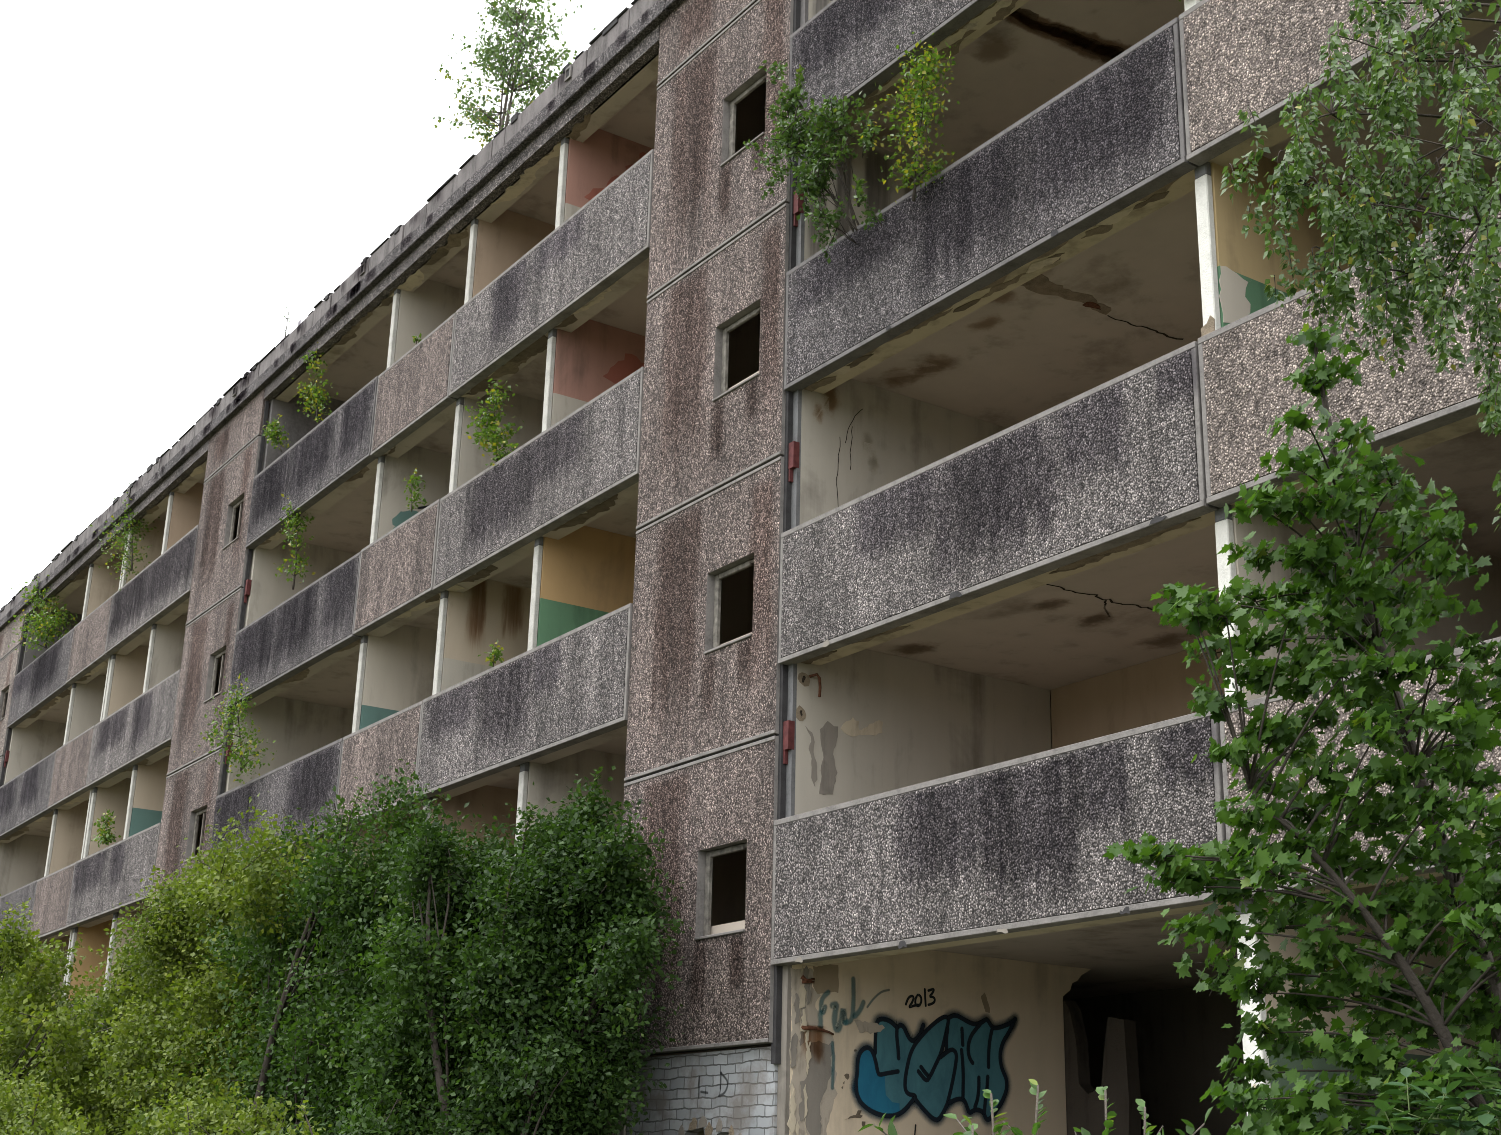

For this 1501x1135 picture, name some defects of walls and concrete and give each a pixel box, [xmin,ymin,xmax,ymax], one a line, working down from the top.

crack [1107,315,1184,340]
crack [1046,584,1157,617]
flaking render [787,957,849,1135]
spalling [678,1116,742,1135]